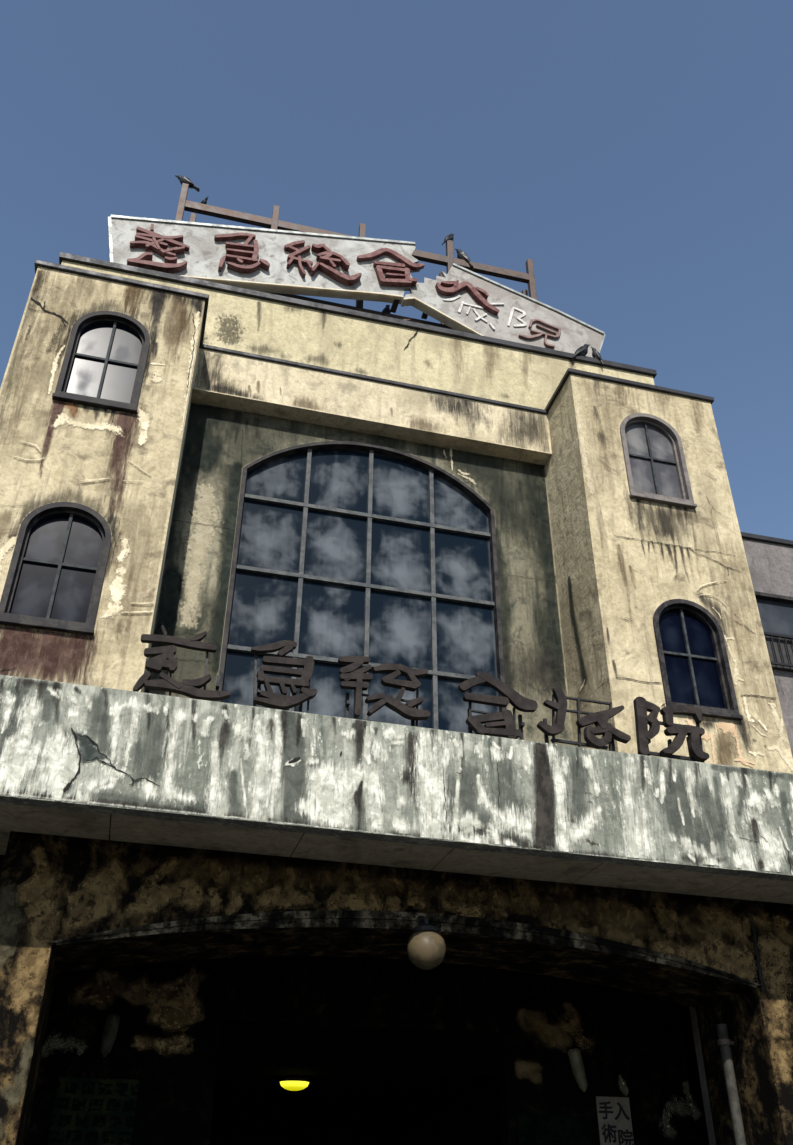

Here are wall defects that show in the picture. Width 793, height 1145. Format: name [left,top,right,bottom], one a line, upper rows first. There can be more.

crack [30,298,69,326]
flaking render [54,413,123,436]
flaking render [138,408,150,446]
leakage [151,403,259,647]
flaking render [100,538,130,618]
rust [0,625,96,685]
leakage [0,678,60,754]
crack [63,728,160,792]
leakage [269,710,310,824]
leakage [392,729,626,857]
peeling [620,697,793,872]
leakage [658,759,793,865]